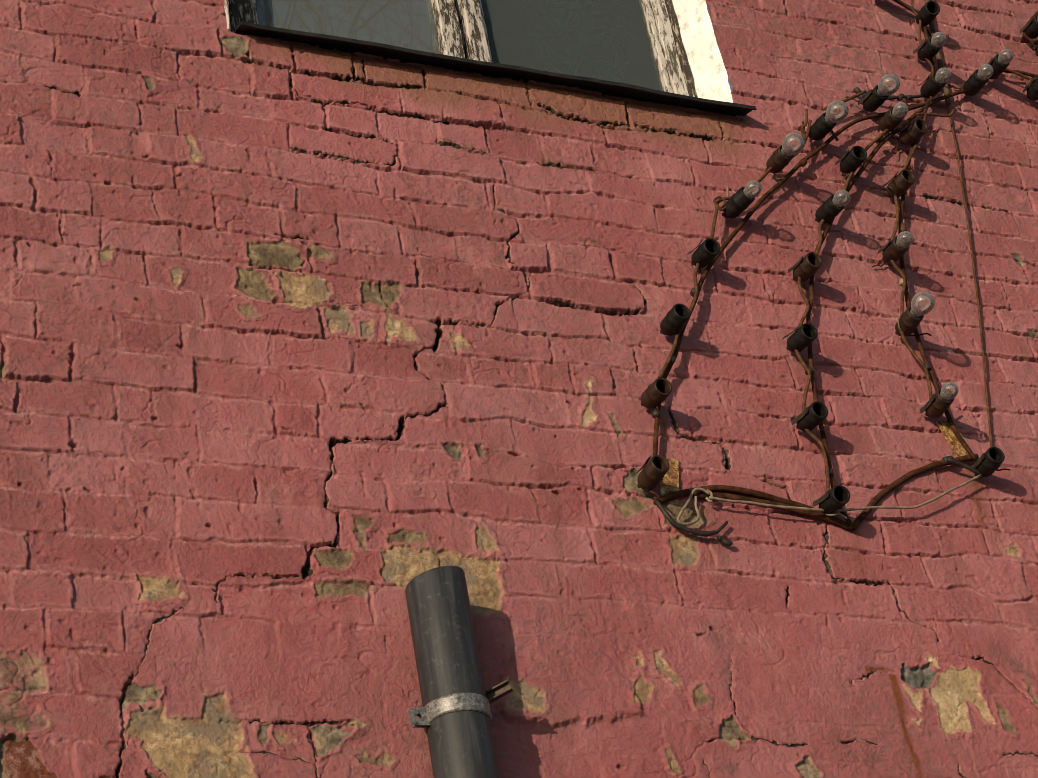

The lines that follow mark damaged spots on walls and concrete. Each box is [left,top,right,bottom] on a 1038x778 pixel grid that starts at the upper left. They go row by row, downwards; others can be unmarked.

peeling [230,230,424,349]
crack [114,183,533,778]
peeling [306,510,511,620]
crack [784,584,792,609]
crack [822,522,1038,709]
peeling [0,645,122,778]
peeling [119,679,400,778]
peeling [501,672,552,723]
crack [702,654,810,778]
crack [840,737,880,747]
peeling [899,652,1021,741]
crack [998,750,1038,758]